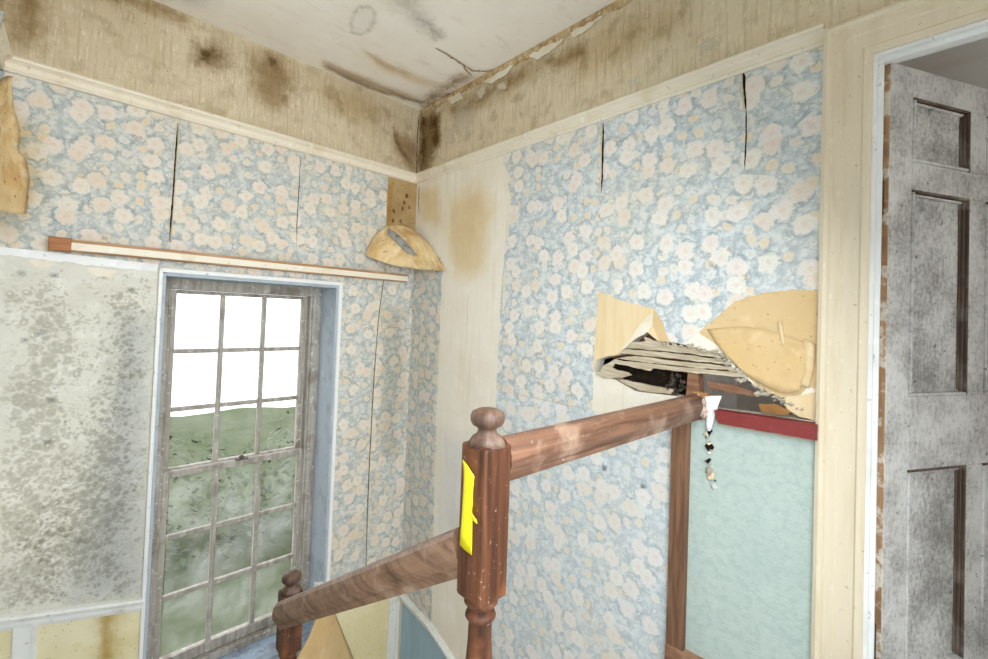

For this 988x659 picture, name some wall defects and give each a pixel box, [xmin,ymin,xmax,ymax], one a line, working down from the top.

crack [435,48,493,76]
spalling [422,0,632,144]
flaking render [386,177,417,231]
spalling [595,309,816,421]
damp [0,255,157,615]